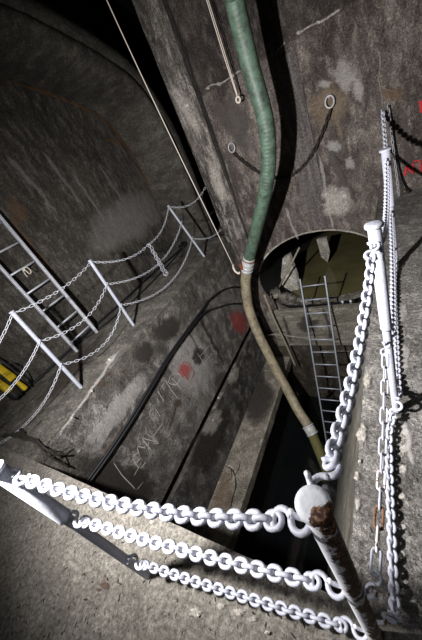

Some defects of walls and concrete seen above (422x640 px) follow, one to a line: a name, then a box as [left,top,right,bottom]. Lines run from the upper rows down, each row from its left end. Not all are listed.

rust [309,85,345,138]